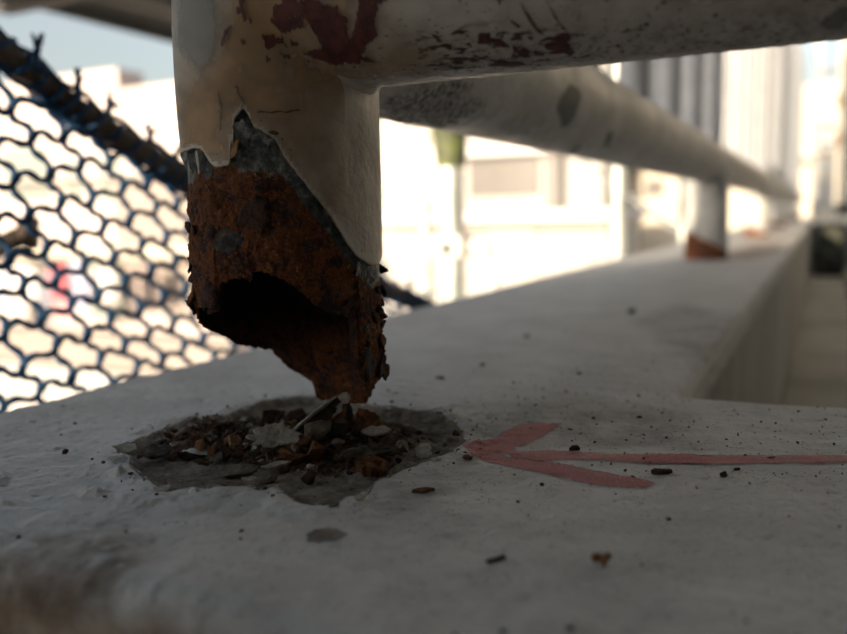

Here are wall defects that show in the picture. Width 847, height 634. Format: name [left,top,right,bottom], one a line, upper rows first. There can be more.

peeling [177,0,216,70]
peeling [230,119,251,159]
spalling [219,396,326,428]
spalling [111,403,472,506]